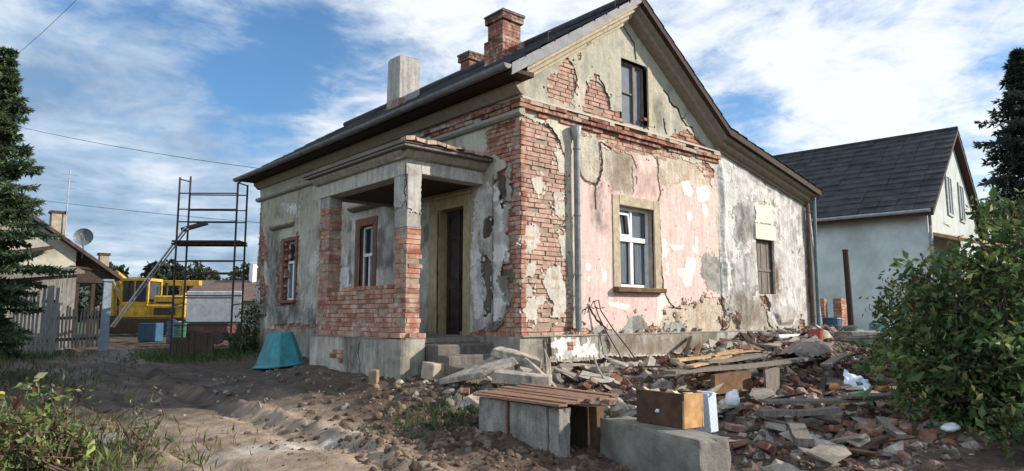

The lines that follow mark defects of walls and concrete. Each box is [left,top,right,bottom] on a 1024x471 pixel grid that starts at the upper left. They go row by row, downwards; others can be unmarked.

spalling [460,116,693,390]
peeling [547,53,756,221]
crack [657,90,704,309]
peeling [645,204,813,391]